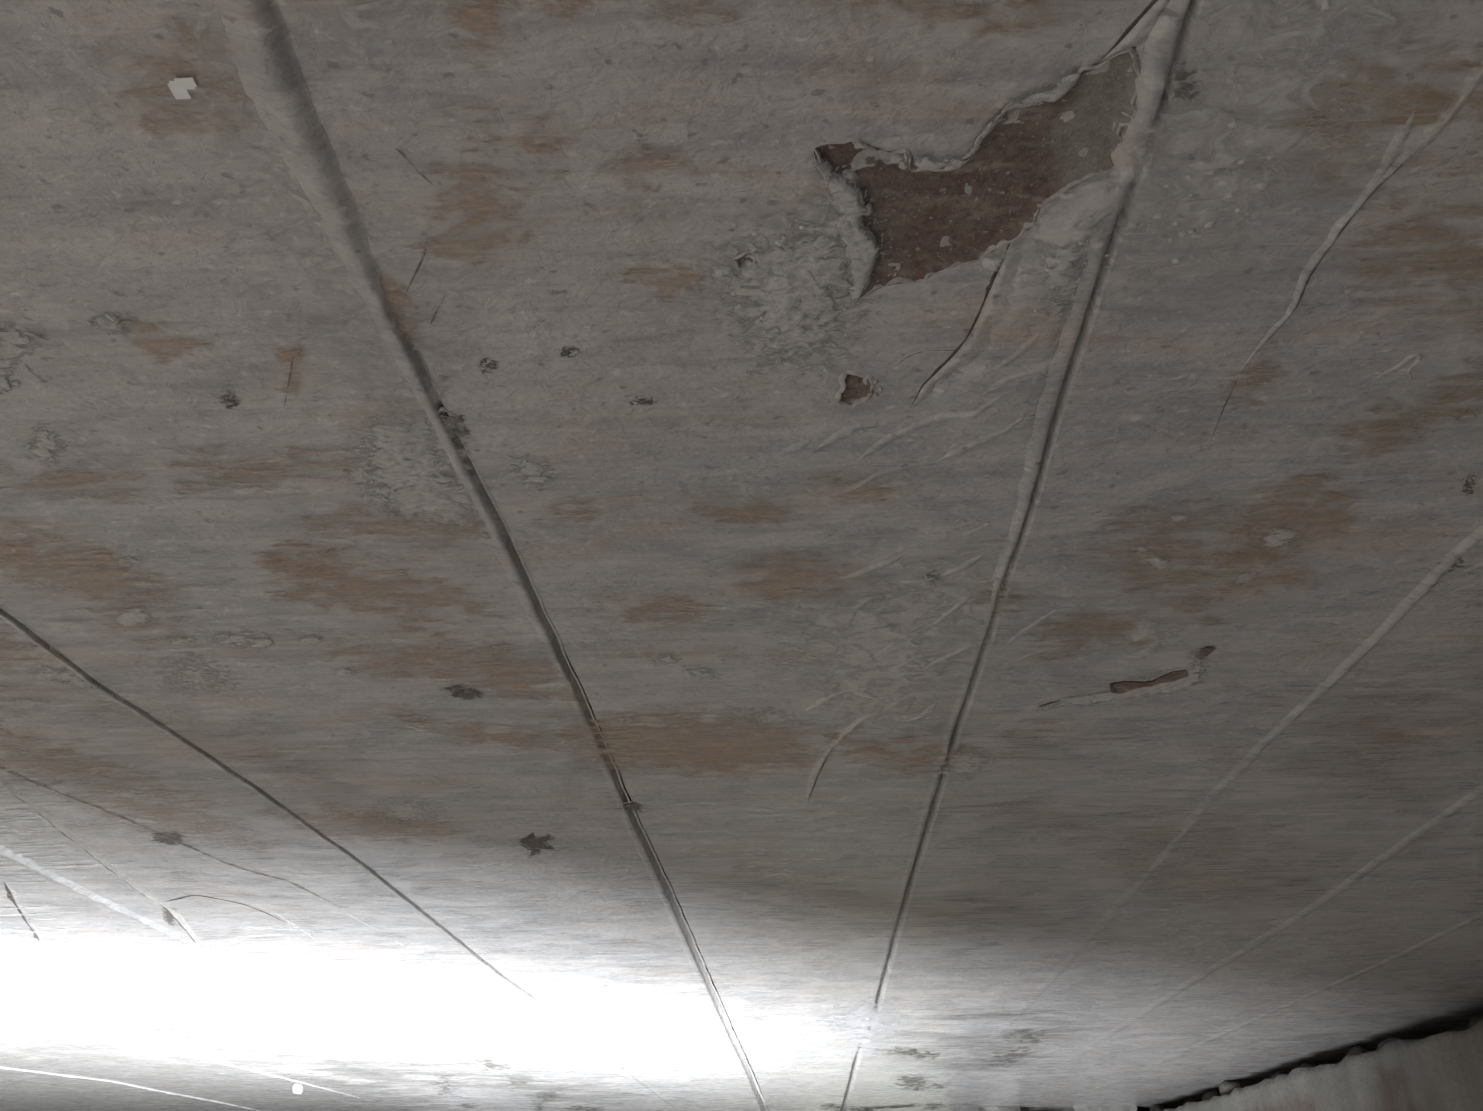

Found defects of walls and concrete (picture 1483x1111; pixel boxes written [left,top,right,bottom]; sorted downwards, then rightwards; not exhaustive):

peeling [695,47,1203,409]
crack [907,242,1023,409]
crack [1219,55,1483,420]
spalling [1036,648,1257,711]